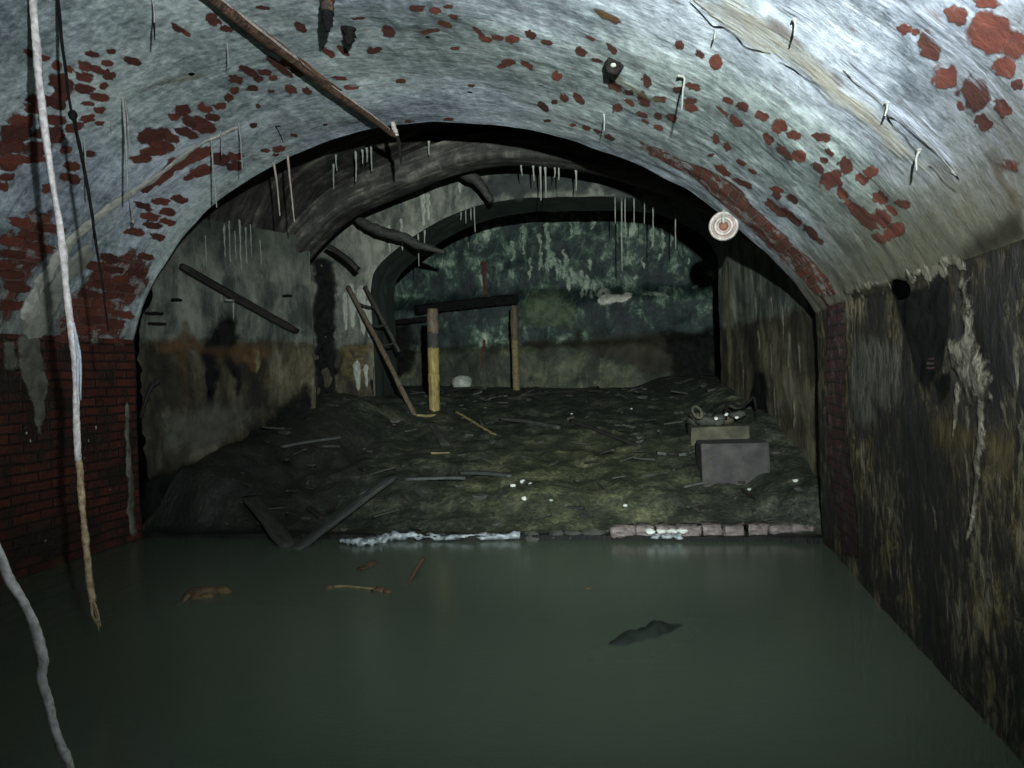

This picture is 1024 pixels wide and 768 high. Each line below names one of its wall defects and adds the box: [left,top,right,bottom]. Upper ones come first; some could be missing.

peeling [0,49,142,194]
peeling [4,248,154,434]
peeling [123,56,312,242]
leakage [202,282,240,409]
leakage [220,258,371,448]
leakage [510,221,668,305]
leakage [525,329,721,376]
peeling [639,133,966,433]
peeling [716,97,910,244]
crack [689,0,959,193]
peeling [896,0,1024,132]
leakage [948,279,1006,572]